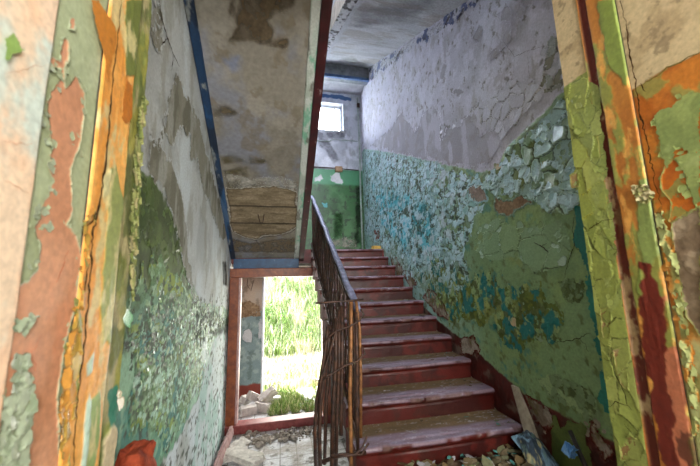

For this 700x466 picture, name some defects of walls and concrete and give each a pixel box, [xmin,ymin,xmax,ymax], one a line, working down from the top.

peeling [0,16,97,466]
crack [73,1,122,464]
peeling [115,80,228,466]
damp [215,106,237,115]
damp [229,0,294,48]
spalling [225,185,298,240]
peeling [368,0,479,81]
peeling [365,36,629,391]
crack [620,1,700,205]
spalling [630,91,700,437]